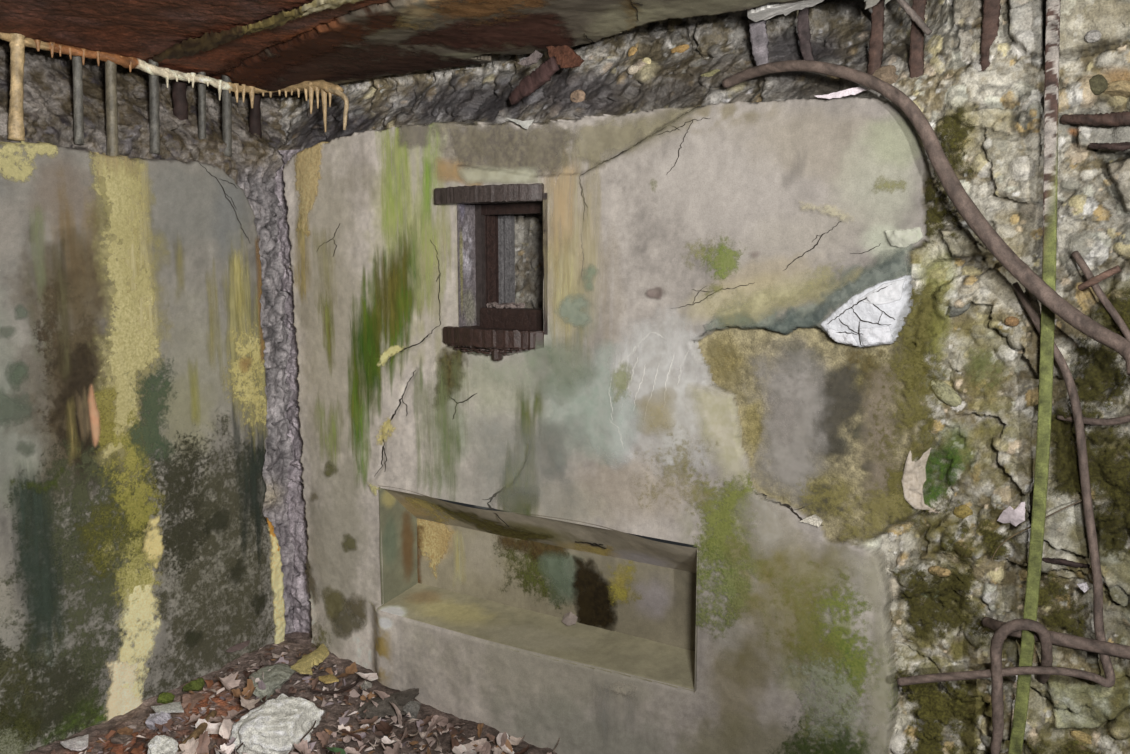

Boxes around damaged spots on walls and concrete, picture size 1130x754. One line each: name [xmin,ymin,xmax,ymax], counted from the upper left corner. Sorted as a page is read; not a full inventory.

damp [0,141,58,182]
spalling [0,39,107,155]
corrosion [206,0,576,139]
damp [421,123,446,278]
spalling [116,10,867,174]
crack [578,106,710,289]
damp [0,151,286,754]
damp [354,250,406,479]
crack [375,240,441,475]
crack [754,491,823,526]
crack [828,284,901,347]
spalling [698,0,1130,754]